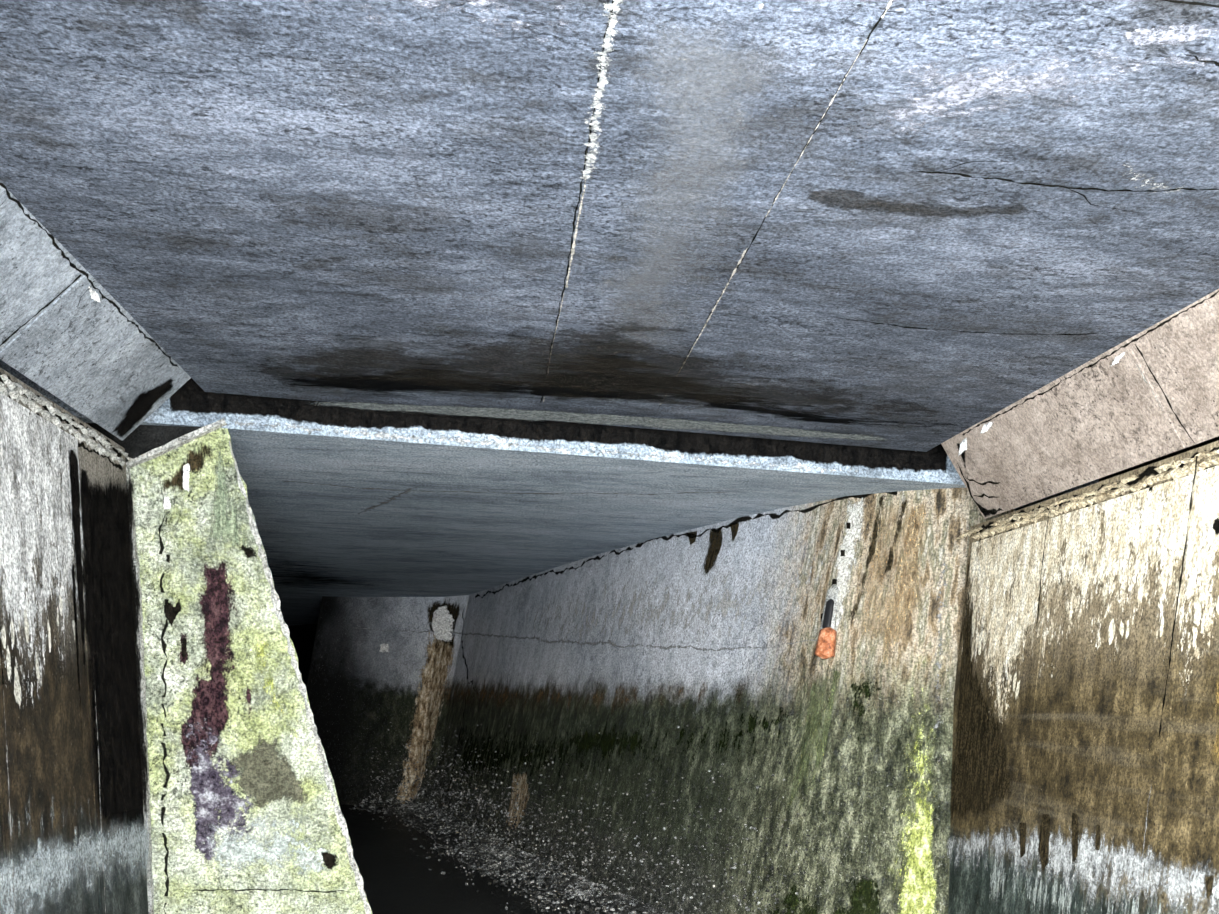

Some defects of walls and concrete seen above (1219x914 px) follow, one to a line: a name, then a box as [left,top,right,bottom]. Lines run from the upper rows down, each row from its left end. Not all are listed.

crack [551,0,623,348]
crack [687,0,893,357]
crack [0,182,178,470]
damp [113,318,966,473]
damp [0,449,151,914]
crack [158,490,348,914]
damp [851,495,908,623]
damp [933,550,1012,819]
damp [899,804,936,914]
damp [947,790,1219,914]